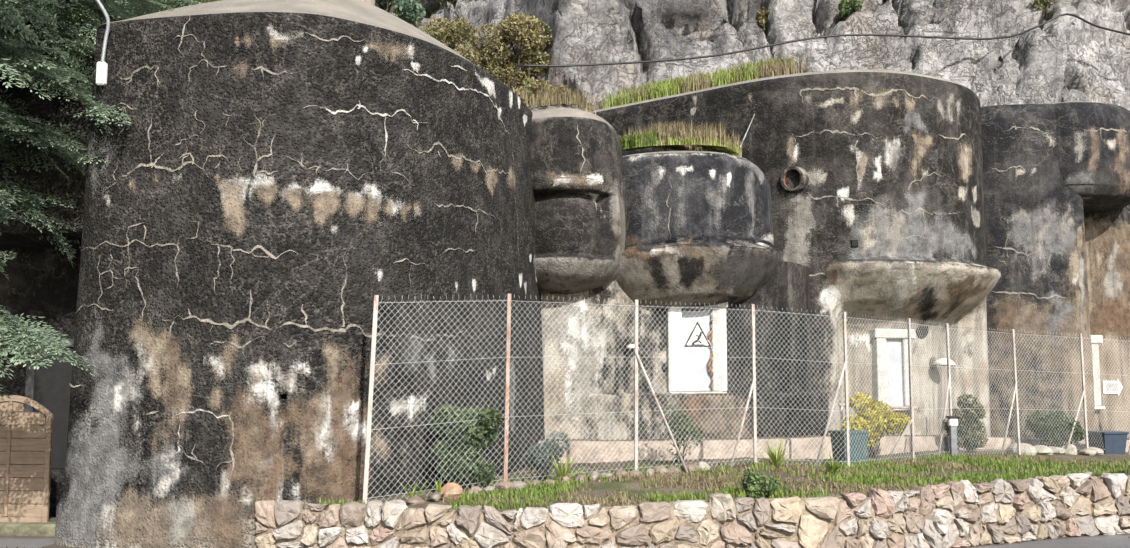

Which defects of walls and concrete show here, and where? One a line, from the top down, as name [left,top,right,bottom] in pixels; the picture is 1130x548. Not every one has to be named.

crack [105,14,518,283]
leakage [214,175,419,236]
leakage [787,136,799,163]
leakage [837,111,976,323]
crack [77,221,482,356]
leakage [57,319,255,548]
crack [147,409,235,478]
leakage [246,360,297,396]